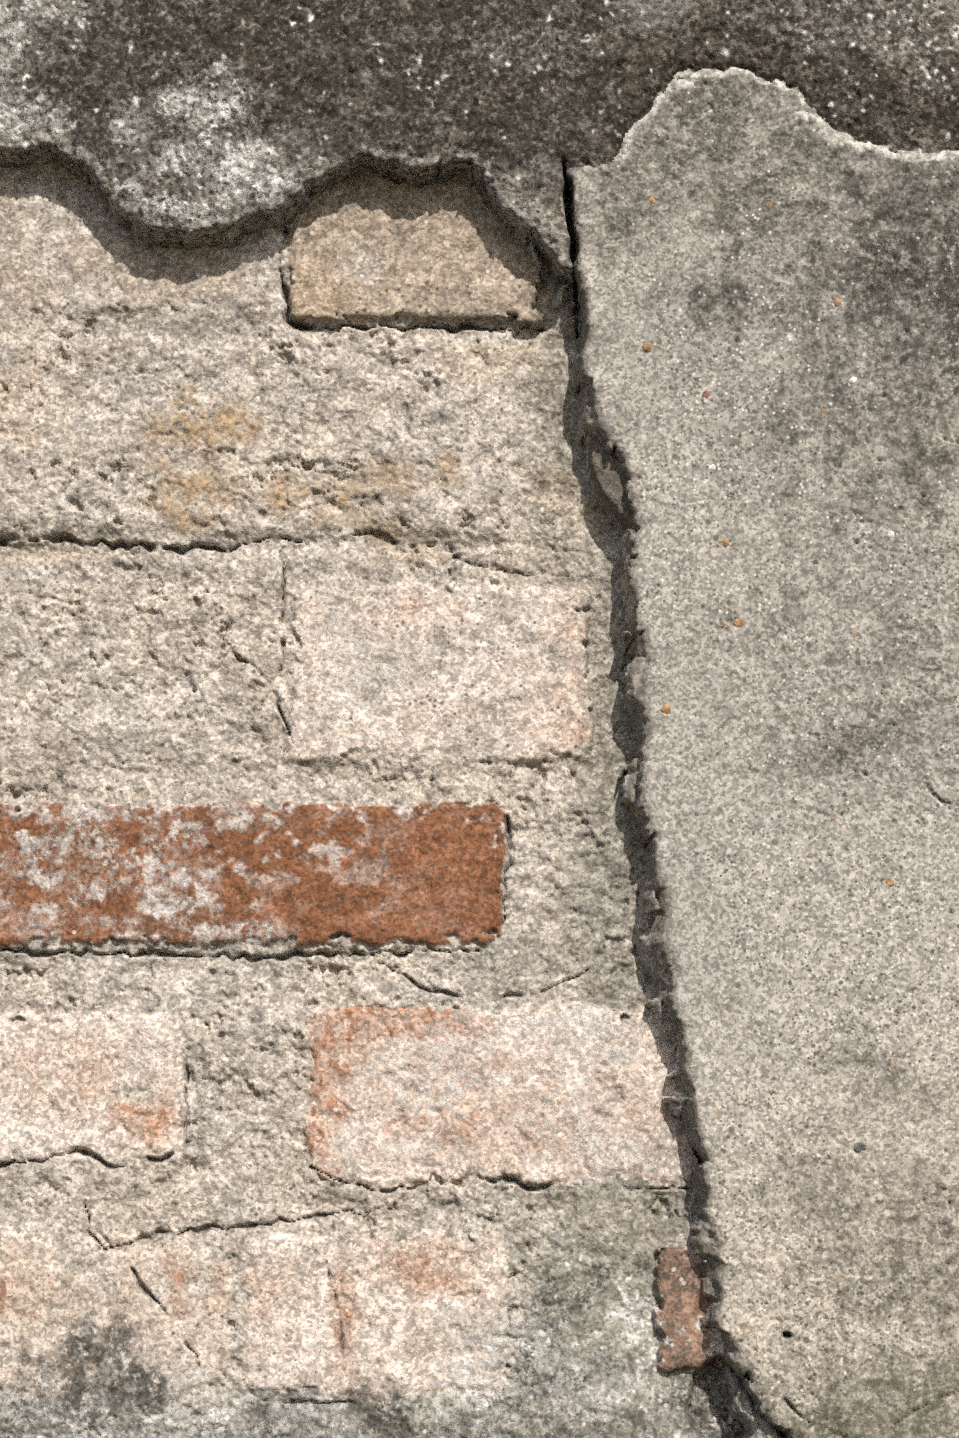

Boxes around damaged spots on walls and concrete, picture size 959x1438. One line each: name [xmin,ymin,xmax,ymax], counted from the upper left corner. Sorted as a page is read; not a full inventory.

flaking render [0,131,797,1438]